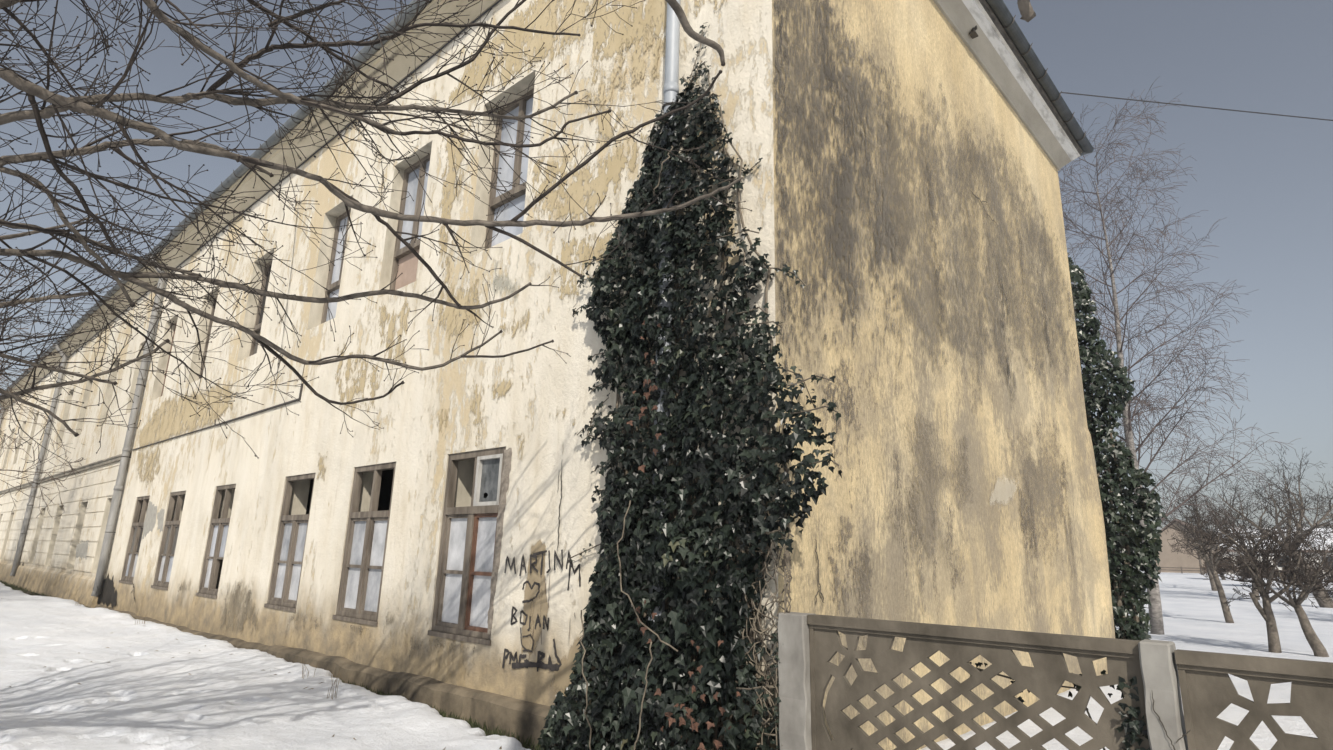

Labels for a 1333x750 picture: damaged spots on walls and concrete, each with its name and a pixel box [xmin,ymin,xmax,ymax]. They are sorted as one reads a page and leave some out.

peeling [449,0,667,302]
peeling [435,126,481,343]
damp [771,0,1081,480]
peeling [136,381,233,483]
peeling [334,301,410,417]
peeling [468,370,523,446]
damp [95,574,117,607]
spalling [141,501,165,540]
damp [220,586,257,631]
damp [827,464,874,619]
damp [888,413,974,614]
damp [1008,416,1078,605]